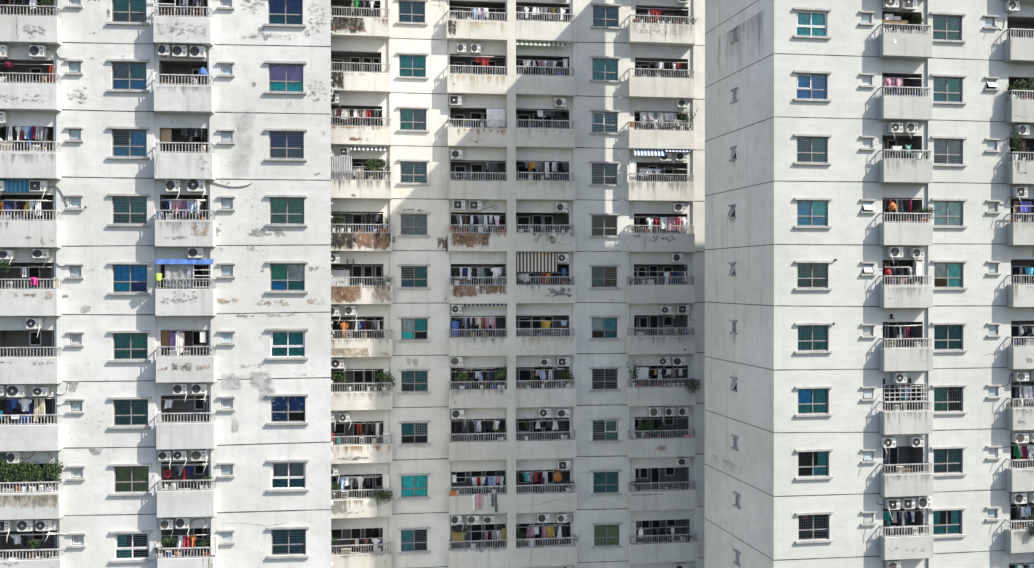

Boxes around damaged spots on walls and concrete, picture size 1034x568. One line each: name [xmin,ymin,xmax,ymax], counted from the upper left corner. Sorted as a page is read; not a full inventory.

damp [331,17,364,33]
mould [331,233,356,249]